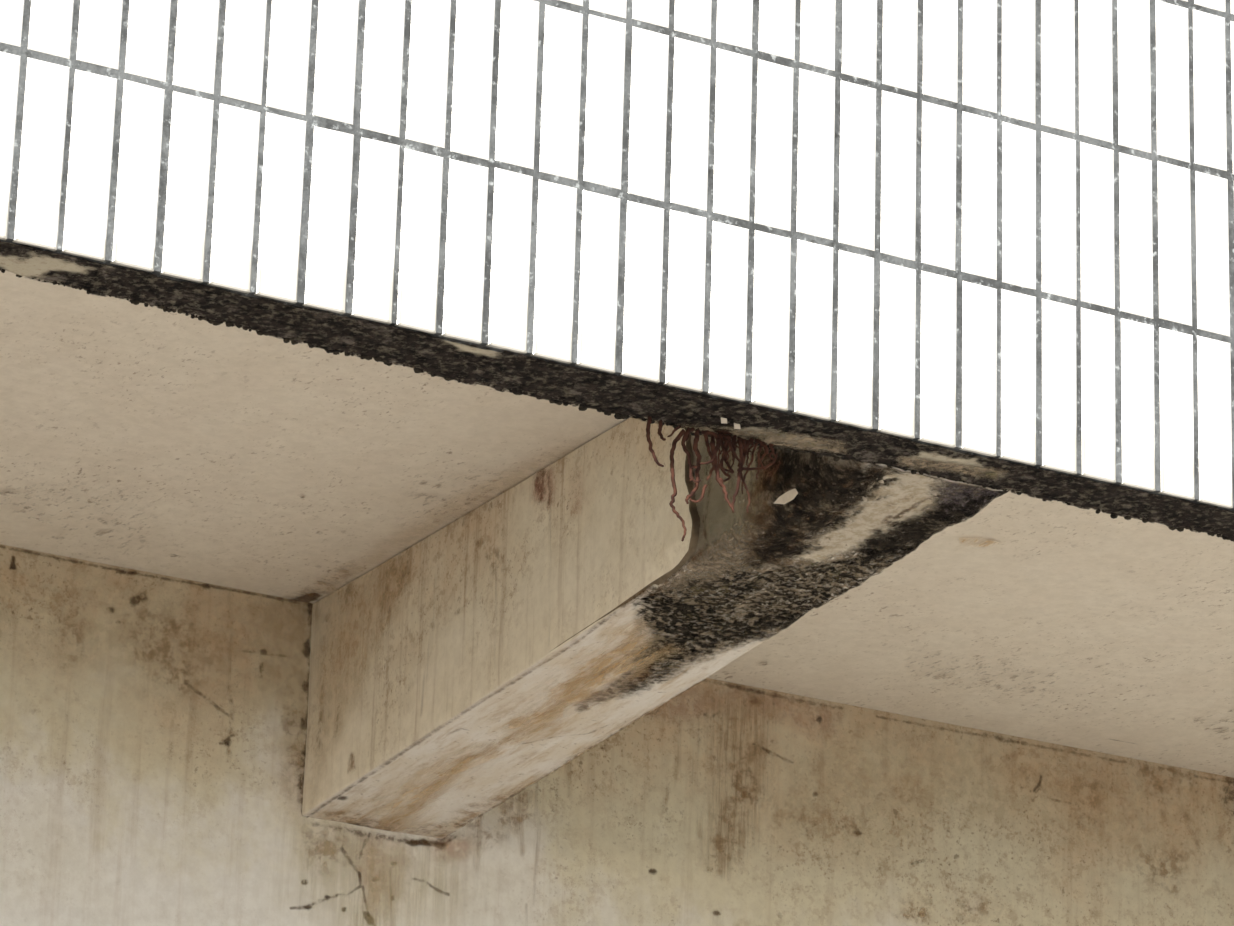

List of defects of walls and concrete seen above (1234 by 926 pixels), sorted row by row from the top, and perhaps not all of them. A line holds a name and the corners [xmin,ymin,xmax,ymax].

leakage [0,242,1234,711]
crack [291,835,370,909]